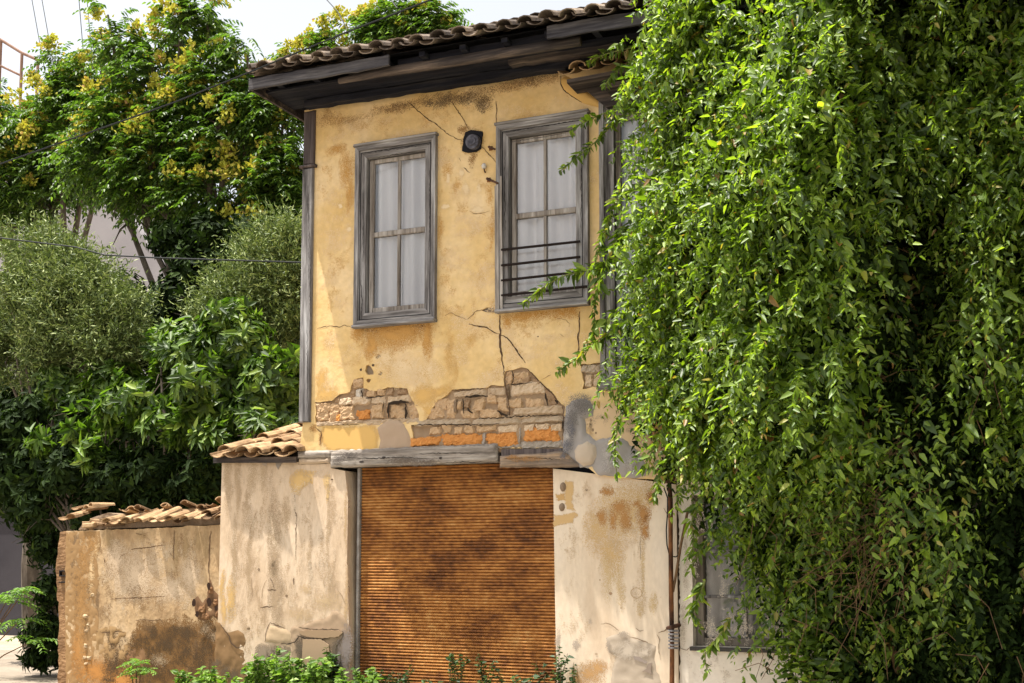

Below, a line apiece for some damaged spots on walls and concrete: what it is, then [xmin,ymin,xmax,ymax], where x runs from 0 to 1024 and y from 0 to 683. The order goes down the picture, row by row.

crack [407,99,495,173]
spalling [316,355,565,452]
crack [445,310,561,404]
spalling [581,363,600,389]
leakage [70,451,349,683]
leakage [601,538,658,619]
spalling [192,578,250,683]
spalling [281,611,354,683]